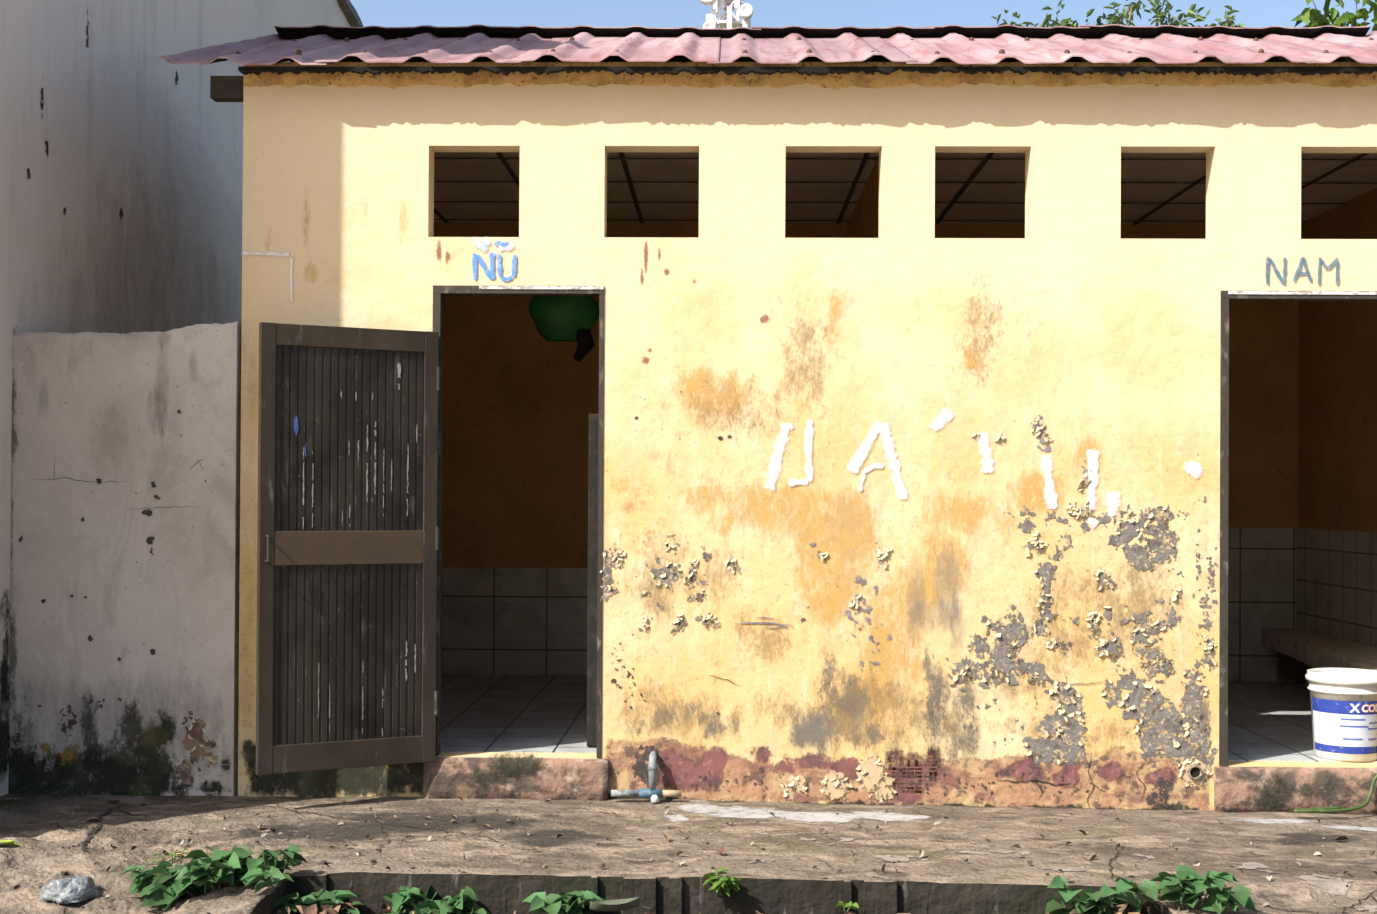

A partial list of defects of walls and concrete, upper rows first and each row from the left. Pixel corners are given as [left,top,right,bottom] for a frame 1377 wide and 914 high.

peeling [1029,414,1055,452]
leakage [0,594,604,846]
peeling [600,543,626,602]
peeling [611,533,741,709]
peeling [632,460,1218,810]
leakage [1230,774,1377,844]